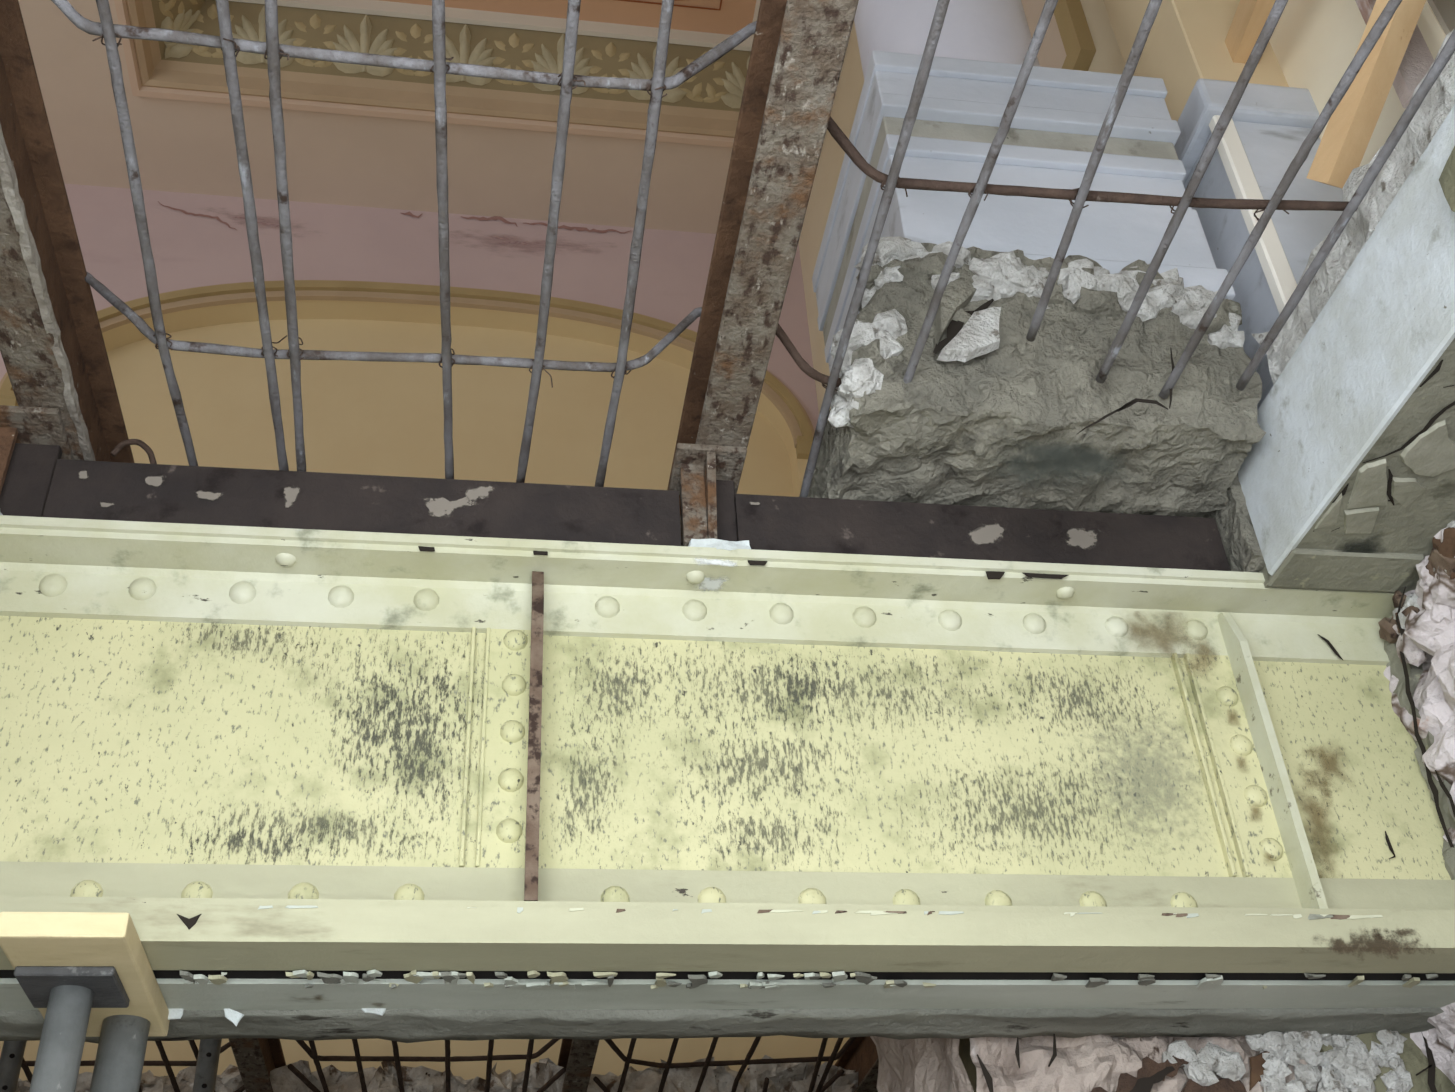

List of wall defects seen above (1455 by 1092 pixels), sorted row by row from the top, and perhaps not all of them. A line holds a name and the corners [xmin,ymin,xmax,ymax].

spalling [828,29,1455,428]
crack [1313,360,1455,532]
mould [166,622,483,864]
corrosion [524,571,544,901]
mould [554,641,1158,865]